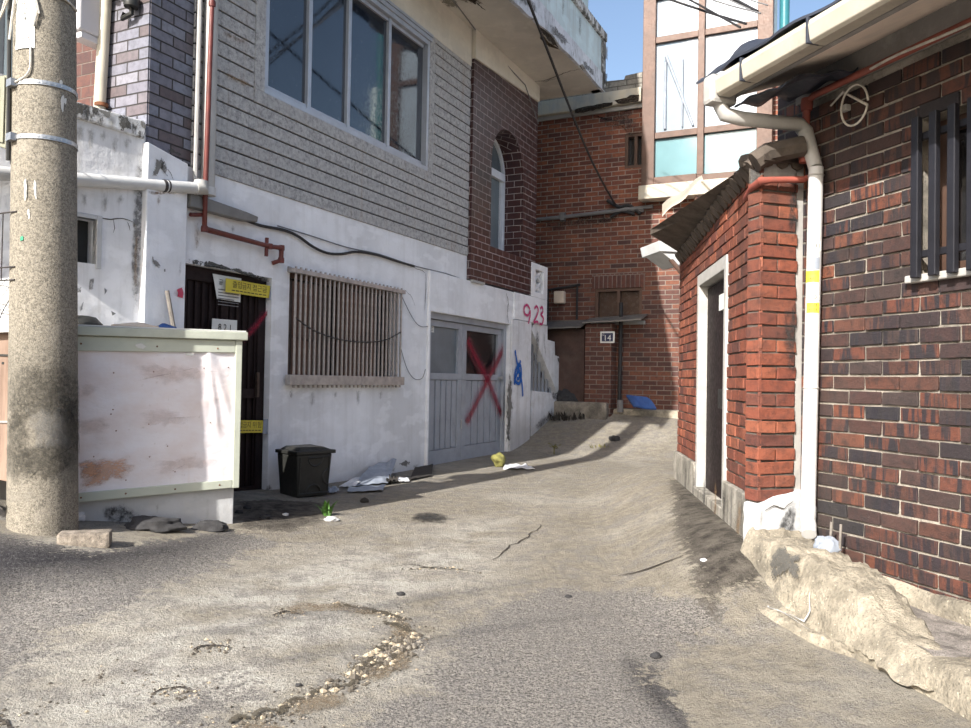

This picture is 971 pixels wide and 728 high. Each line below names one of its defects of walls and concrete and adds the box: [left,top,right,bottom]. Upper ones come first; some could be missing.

peeling [442,0,484,8]
spalling [540,27,567,50]
leakage [132,190,142,295]
leakage [7,370,80,477]
rust [81,461,126,486]
crack [401,524,541,575]
crack [618,556,681,576]